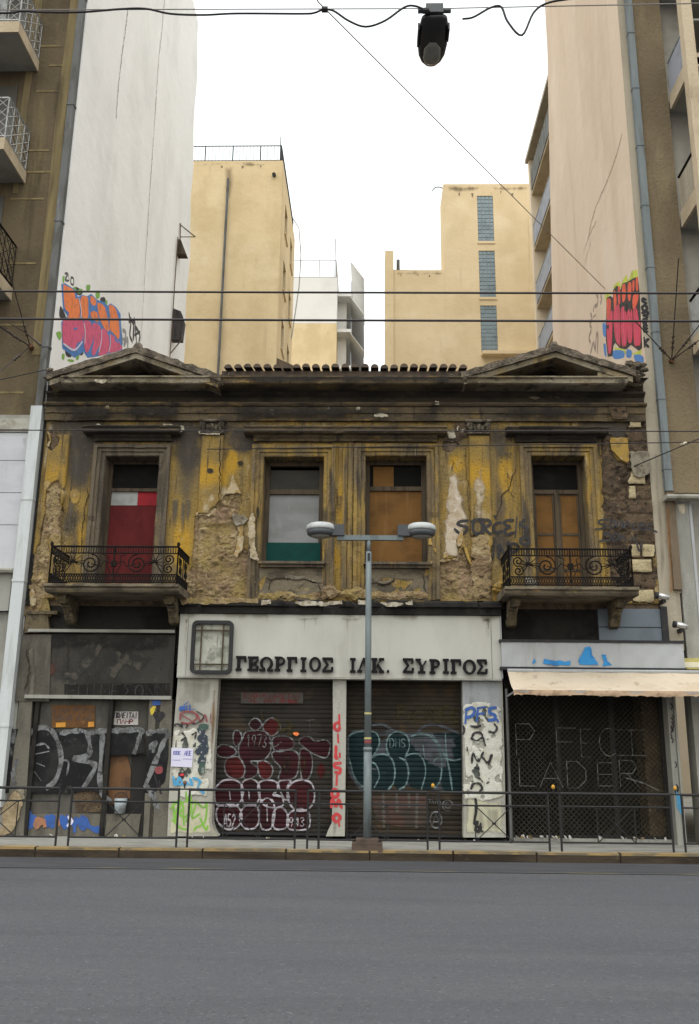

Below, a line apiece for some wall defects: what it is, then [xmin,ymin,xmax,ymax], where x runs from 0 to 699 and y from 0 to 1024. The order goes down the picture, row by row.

spalling [24,481,80,617]
flaking render [175,460,503,607]
crack [496,469,516,517]
flaking render [600,406,658,604]
peeling [466,800,502,833]